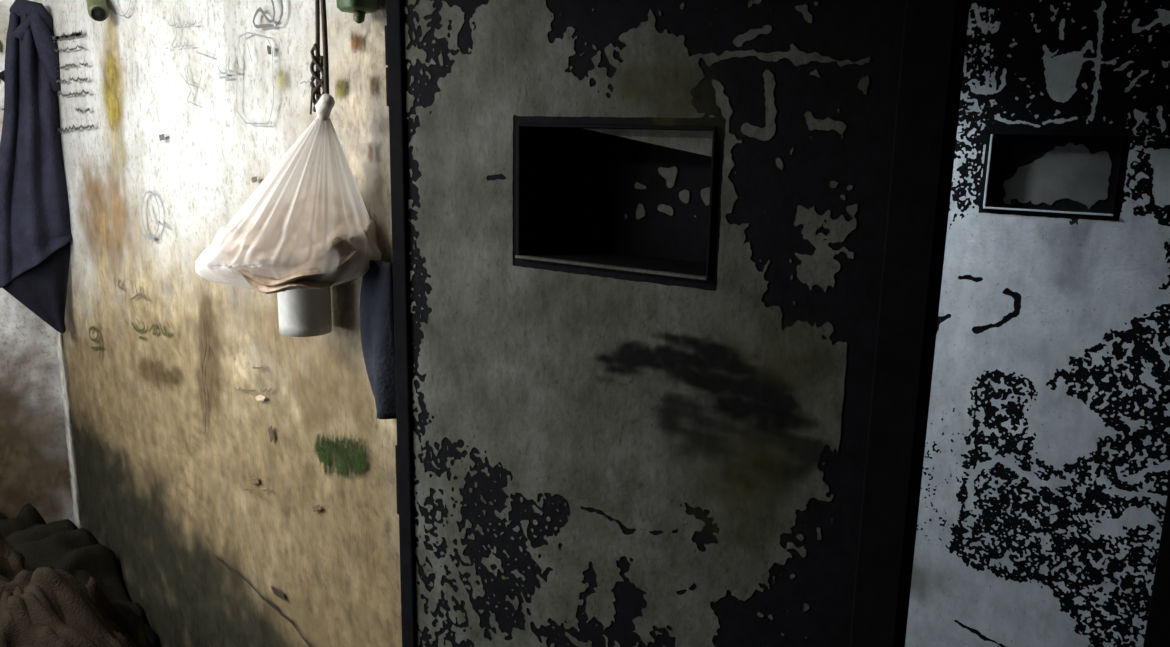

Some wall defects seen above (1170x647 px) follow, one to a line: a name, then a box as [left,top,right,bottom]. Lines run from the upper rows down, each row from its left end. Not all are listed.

corrosion [108,17,122,105]
water stain [0,352,288,647]
water stain [62,242,399,539]
crack [215,555,311,647]
water stain [330,11,389,186]
water stain [363,175,393,262]
peeling [404,0,870,647]
peeling [905,0,1170,647]